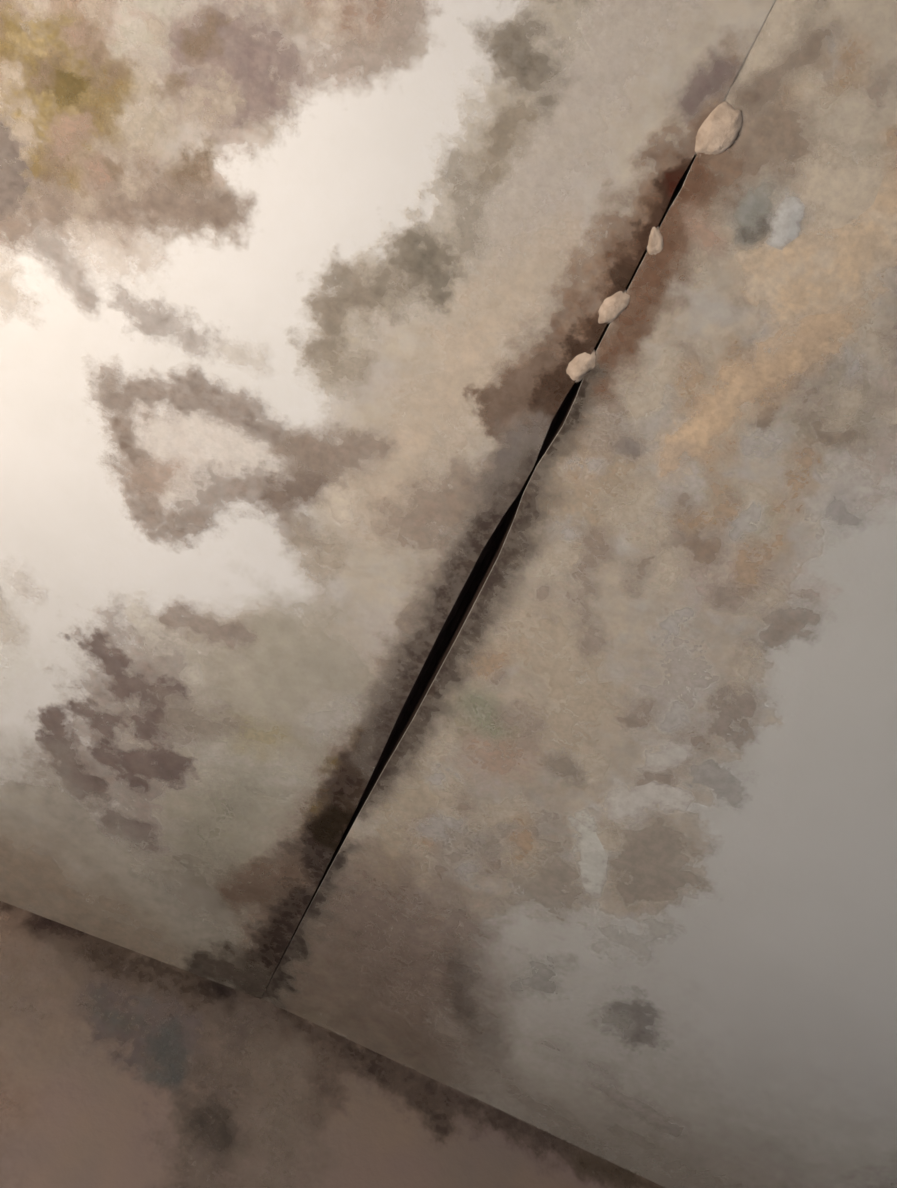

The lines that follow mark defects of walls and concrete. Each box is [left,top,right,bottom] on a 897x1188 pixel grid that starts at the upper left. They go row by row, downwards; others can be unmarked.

water stain [0,0,426,581]
water stain [302,0,595,396]
crack [594,323,610,351]
crack [626,155,696,291]
water stain [0,363,701,1188]
crack [270,379,583,980]